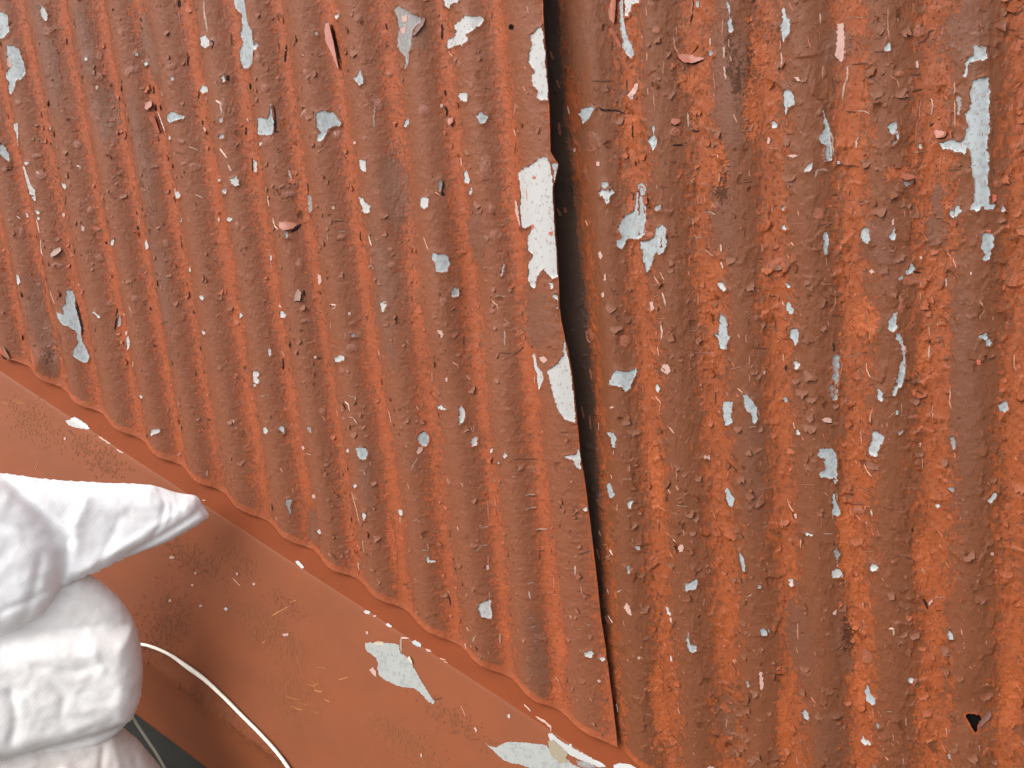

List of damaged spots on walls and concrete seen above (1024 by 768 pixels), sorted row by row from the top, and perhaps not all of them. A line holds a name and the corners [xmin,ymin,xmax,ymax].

peeling [442,0,486,51]
corrosion [622,104,642,154]
corrosion [742,36,770,148]
peeling [517,155,559,310]
corrosion [843,290,881,343]
peeling [532,339,577,431]
peeling [578,0,1024,768]
corrosion [643,435,666,532]
corrosion [835,489,861,583]
peeling [365,637,434,704]
corrosion [844,603,870,715]
peeling [488,704,635,768]